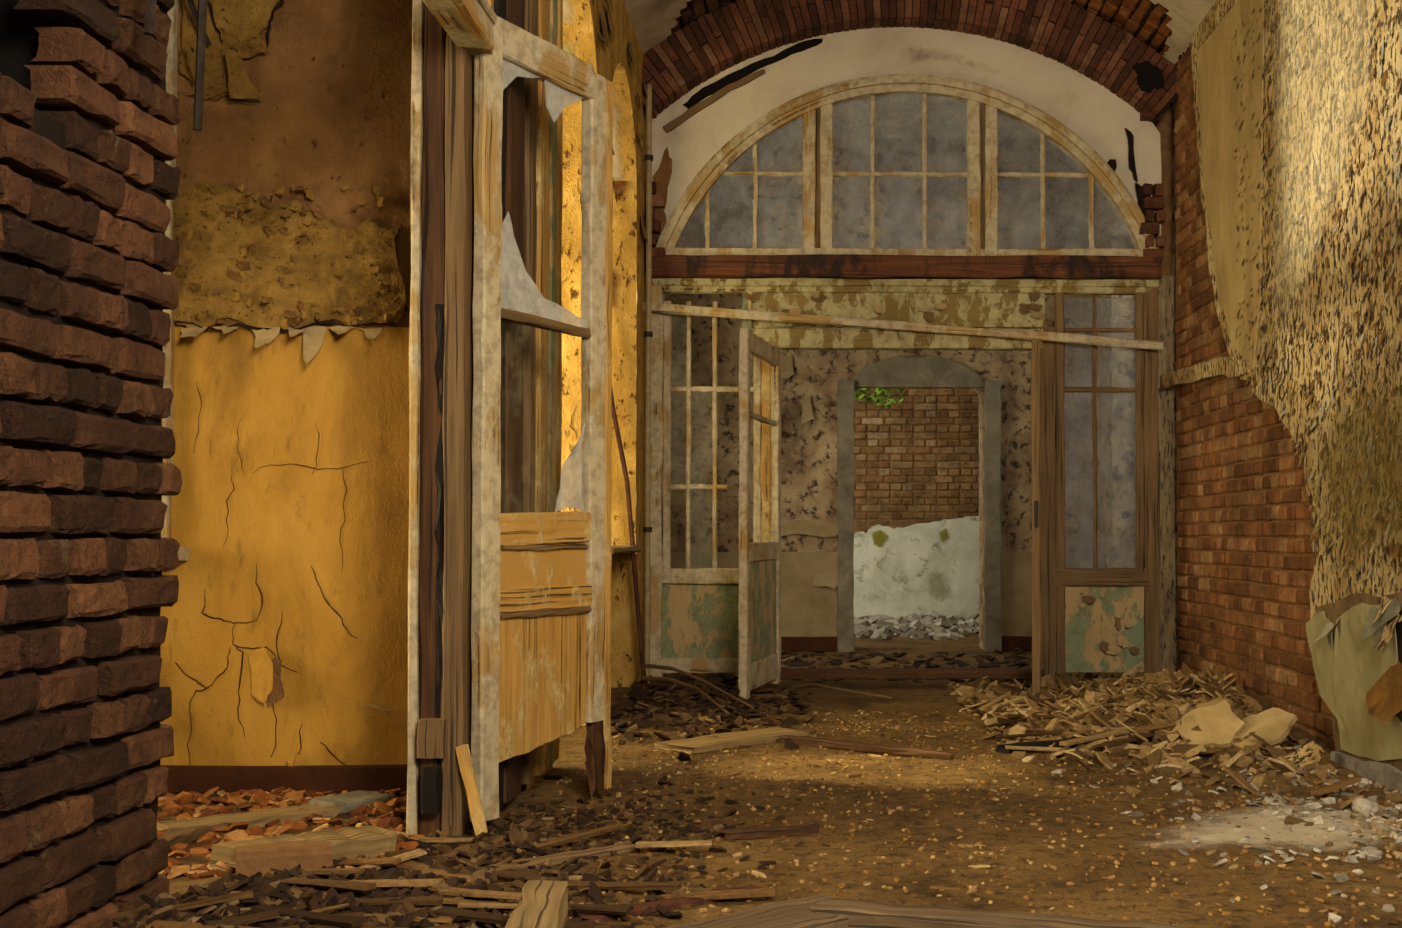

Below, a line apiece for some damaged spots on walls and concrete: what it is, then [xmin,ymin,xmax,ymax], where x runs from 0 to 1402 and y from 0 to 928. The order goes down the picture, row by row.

peeling [179,0,284,103]
flaking render [666,0,737,38]
crack [193,382,202,453]
peeling [172,179,407,366]
peeling [1019,293,1043,319]
flaking render [1064,0,1402,771]
crack [223,419,368,639]
crack [175,566,346,765]